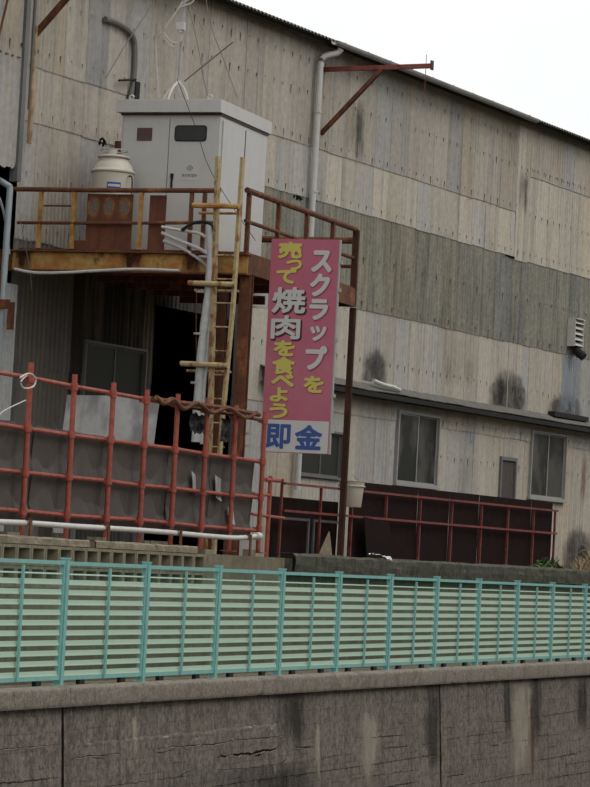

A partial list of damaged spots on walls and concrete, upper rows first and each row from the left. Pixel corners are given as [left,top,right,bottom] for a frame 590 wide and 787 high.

rust [16,252,30,266]
rust [123,254,142,268]
rust [185,255,199,269]
spalling [219,746,313,764]